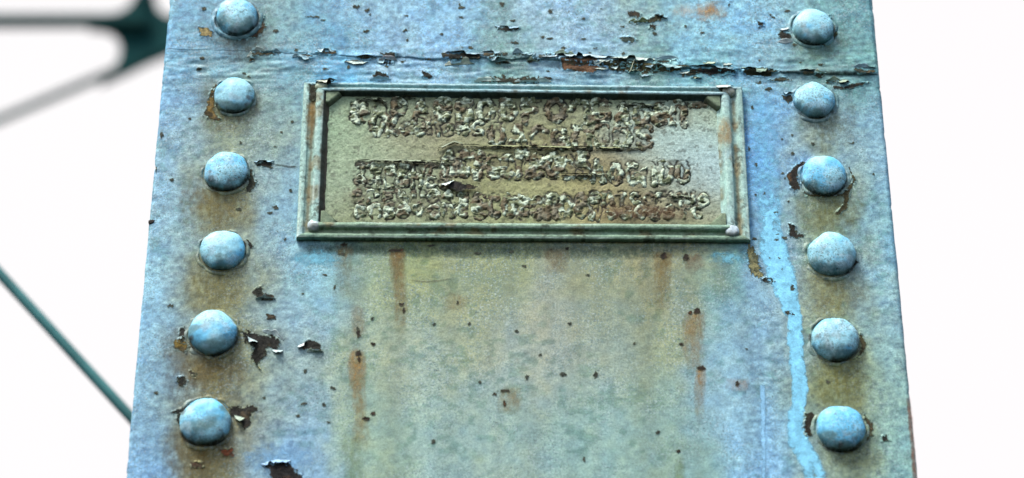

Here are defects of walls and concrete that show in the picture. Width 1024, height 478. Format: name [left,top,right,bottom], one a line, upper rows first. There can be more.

peeling [197,15,406,101]
peeling [421,9,878,103]
peeling [188,82,222,122]
peeling [245,159,274,195]
peeling [781,152,858,215]
rust [388,248,405,314]
peeling [239,285,284,369]
peeling [297,338,324,353]
rust [352,329,376,389]
peeling [227,396,266,431]
peeling [801,412,814,437]
peeling [261,459,306,478]